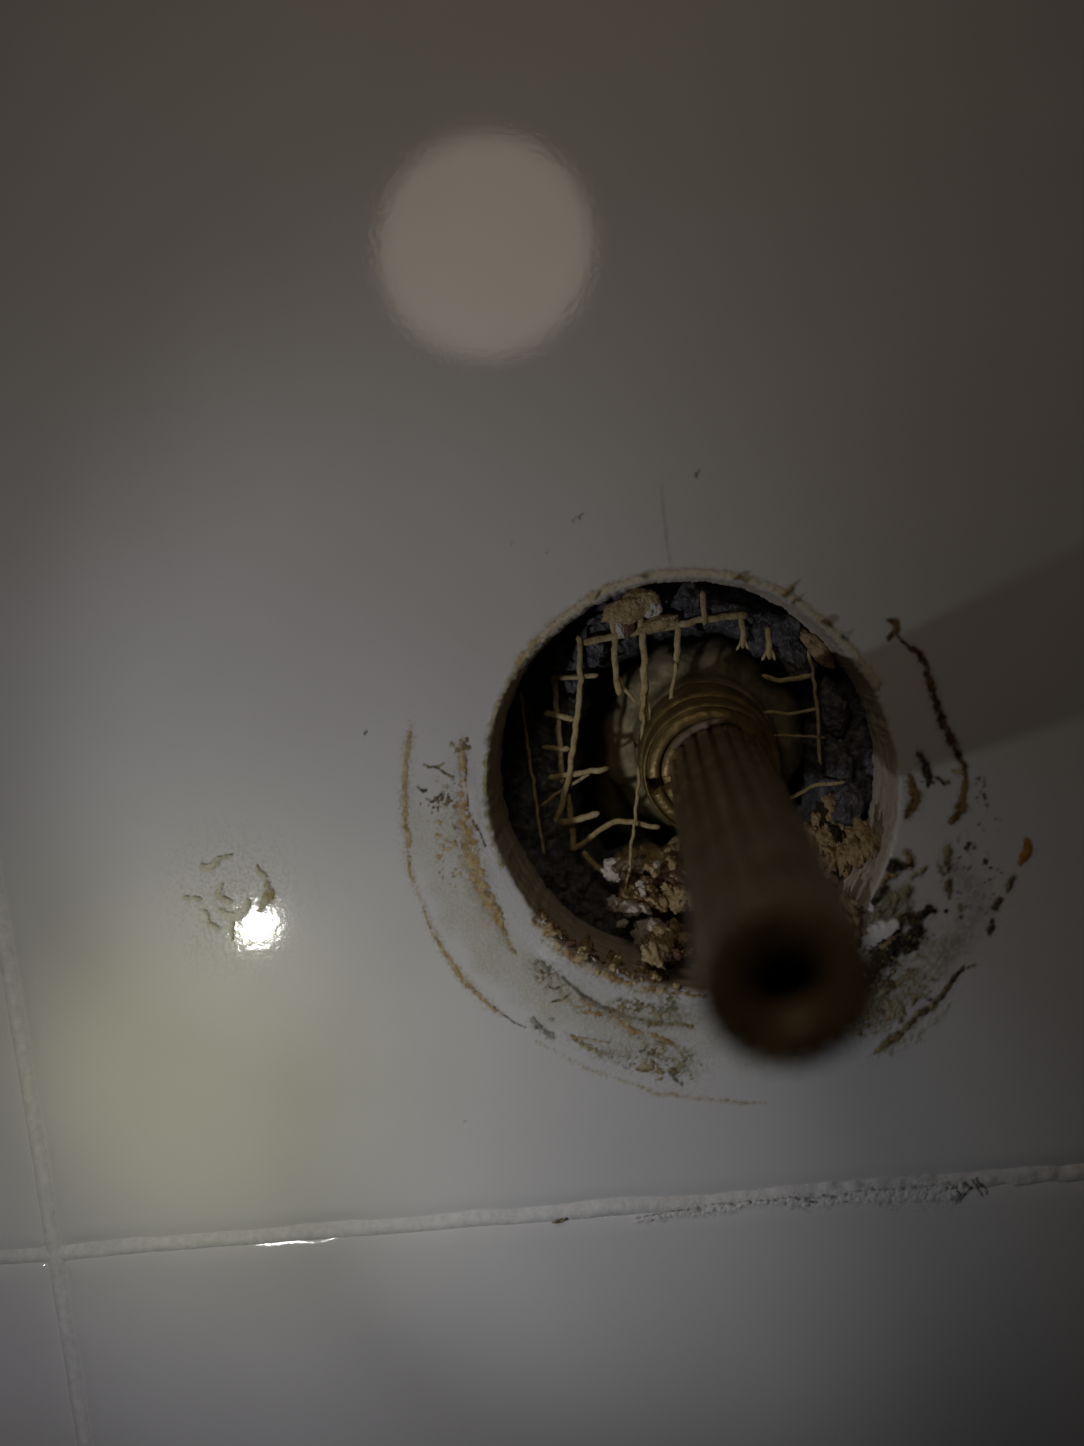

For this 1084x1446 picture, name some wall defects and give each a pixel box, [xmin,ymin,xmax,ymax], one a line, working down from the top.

spalling [482,569,881,869]